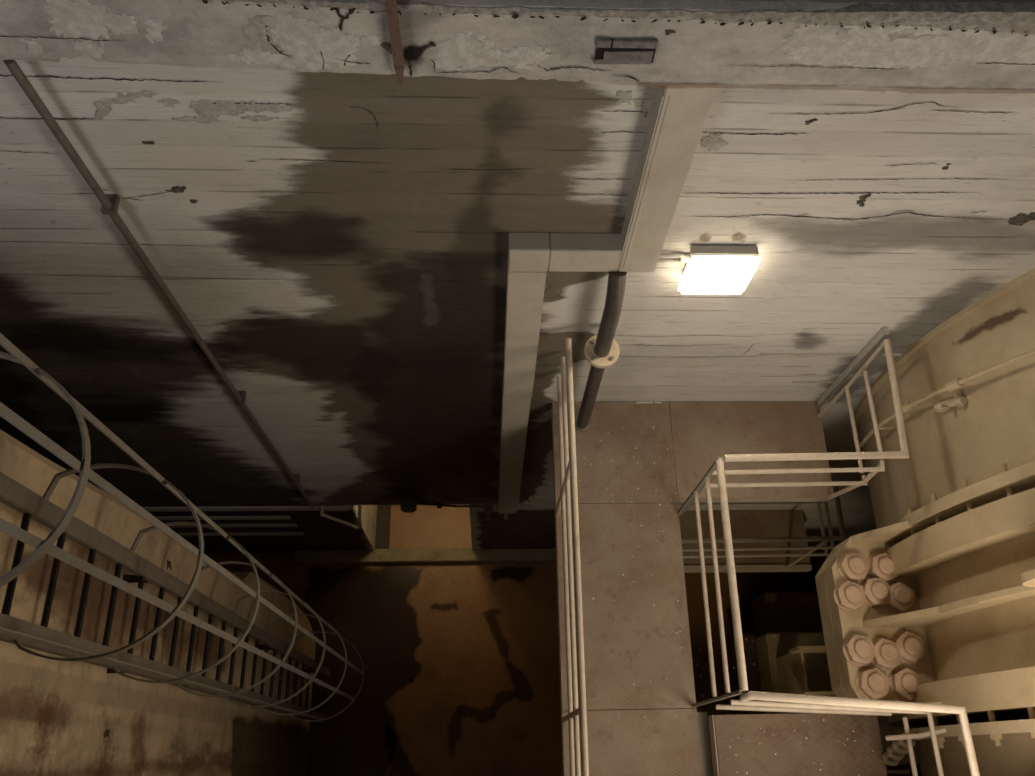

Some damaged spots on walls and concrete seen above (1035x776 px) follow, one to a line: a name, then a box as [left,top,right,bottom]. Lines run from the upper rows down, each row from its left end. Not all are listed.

flaking render [44,0,167,59]
flaking render [228,4,384,72]
crack [331,7,356,31]
crack [320,51,370,68]
flaking render [767,21,1035,70]
spalling [1007,212,1035,226]
water stain [0,72,625,553]
water stain [449,609,533,754]